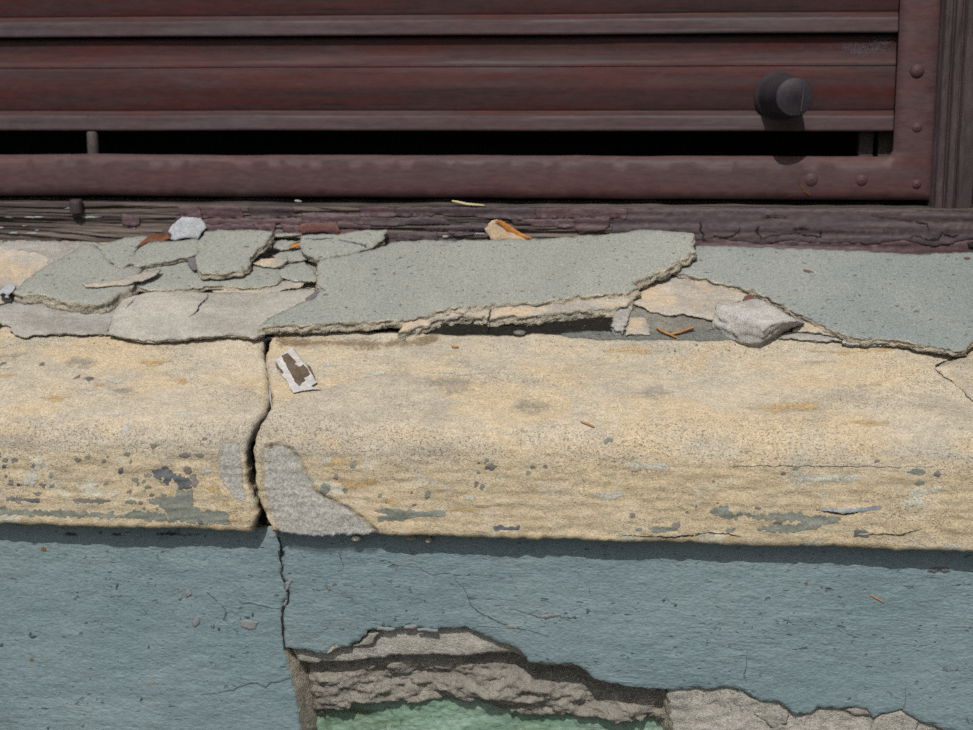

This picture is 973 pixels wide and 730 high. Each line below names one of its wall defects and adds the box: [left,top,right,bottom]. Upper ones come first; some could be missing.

peeling [162,205,973,269]
spalling [625,317,650,336]
spalling [778,331,891,348]
peeling [0,451,230,525]
spalling [219,442,245,501]
crack [249,440,257,481]
spalling [263,445,447,535]
peeling [474,458,497,490]
peeling [630,505,698,533]
peeling [710,505,882,534]
crack [208,509,293,649]
flaking render [284,618,943,730]